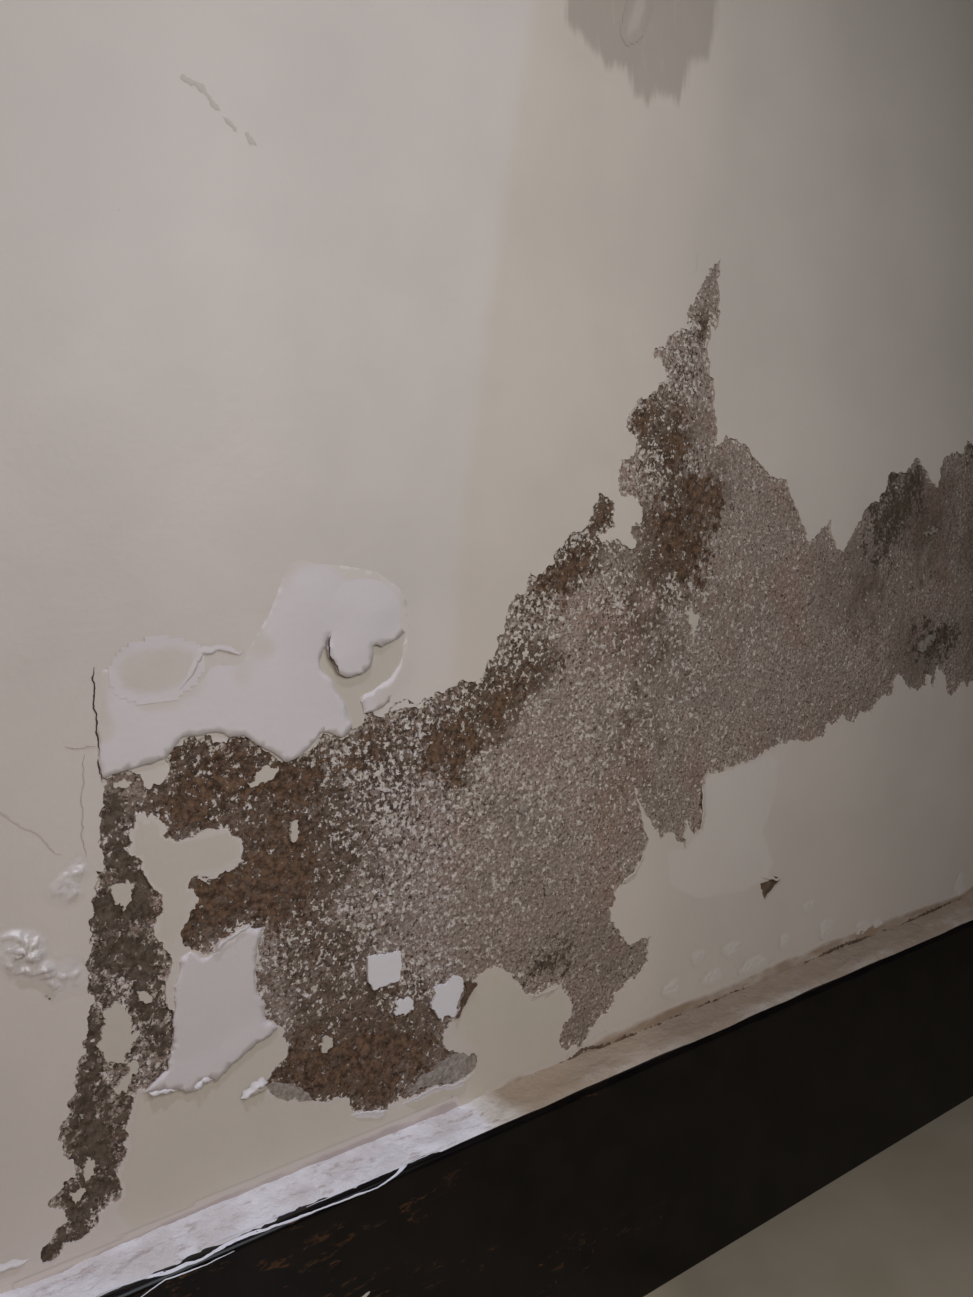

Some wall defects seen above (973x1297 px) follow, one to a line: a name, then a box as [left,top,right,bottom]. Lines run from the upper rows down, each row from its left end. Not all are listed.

water stain [557,0,727,116]
flaking render [41,264,973,1262]